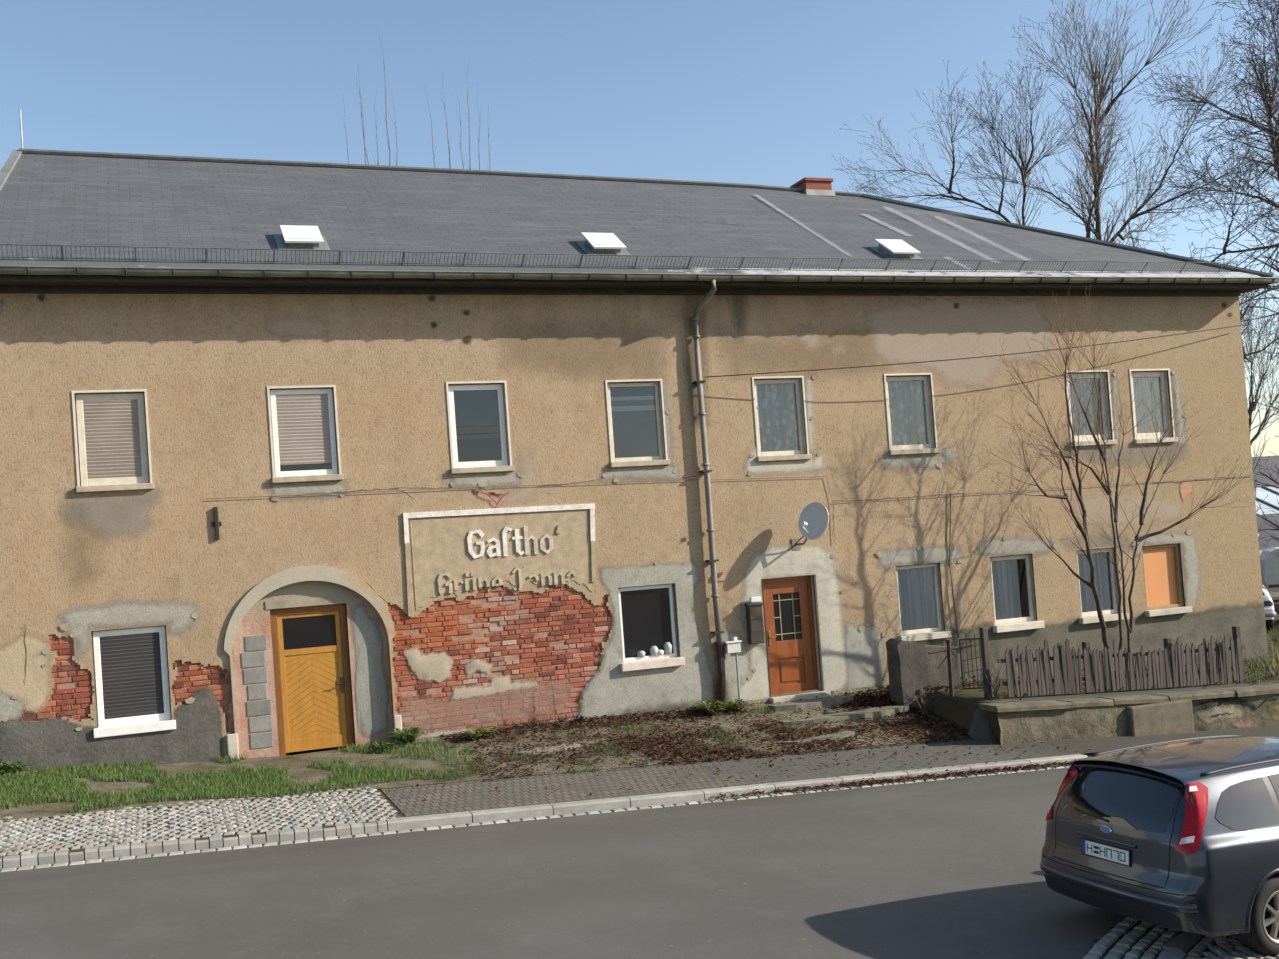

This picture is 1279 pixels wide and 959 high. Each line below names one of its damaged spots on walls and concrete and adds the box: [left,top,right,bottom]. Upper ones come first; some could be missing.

damp [70,496,153,533]
flaking render [0,632,94,731]
flaking render [170,645,236,734]
flaking render [377,584,614,742]
crack [1192,694,1279,722]